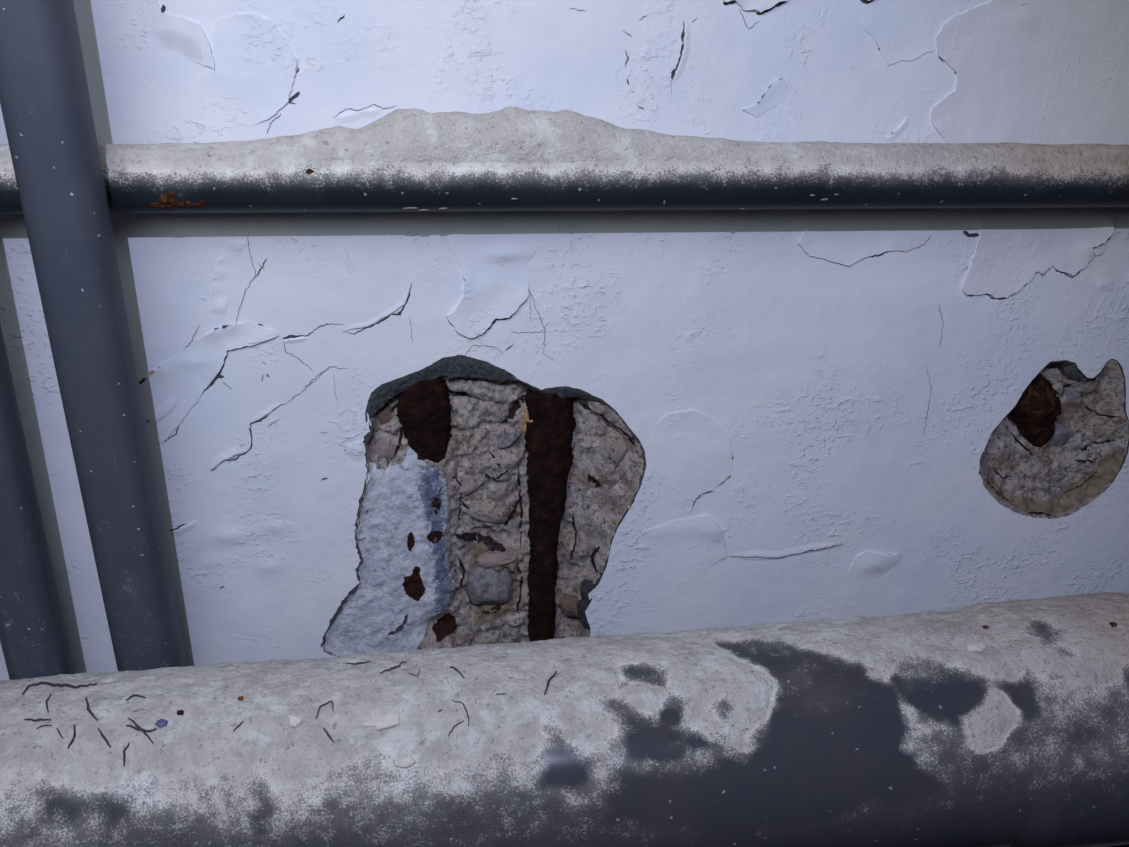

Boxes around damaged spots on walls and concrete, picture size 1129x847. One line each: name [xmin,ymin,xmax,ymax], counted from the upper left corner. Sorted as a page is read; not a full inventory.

crack [671,18,697,93]
peeling [930,0,1129,145]
crack [196,239,413,471]
corrosion [521,408,533,434]
spalling [979,359,1129,519]
corrosion [407,531,443,551]
spalling [323,355,646,657]
corrosion [402,566,425,601]
corrosion [432,612,457,642]